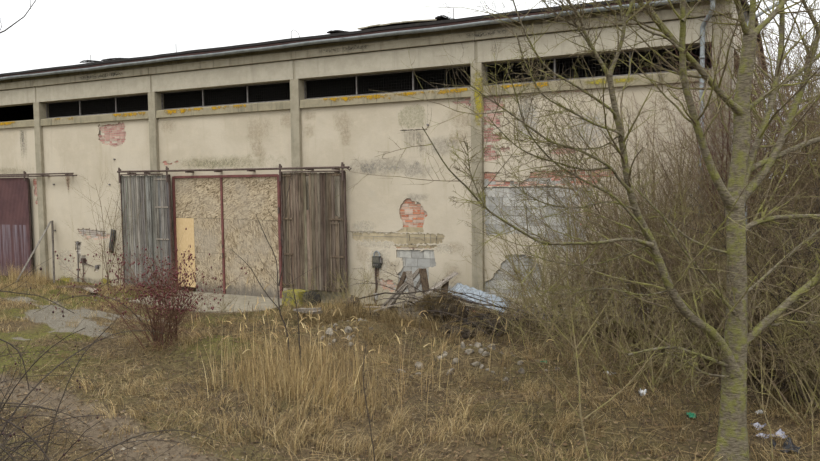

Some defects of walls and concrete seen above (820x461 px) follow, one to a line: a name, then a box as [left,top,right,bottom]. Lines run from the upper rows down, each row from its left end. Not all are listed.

flaking render [98,122,126,147]
flaking render [483,94,514,161]
flaking render [351,198,445,292]
flaking render [484,169,614,252]